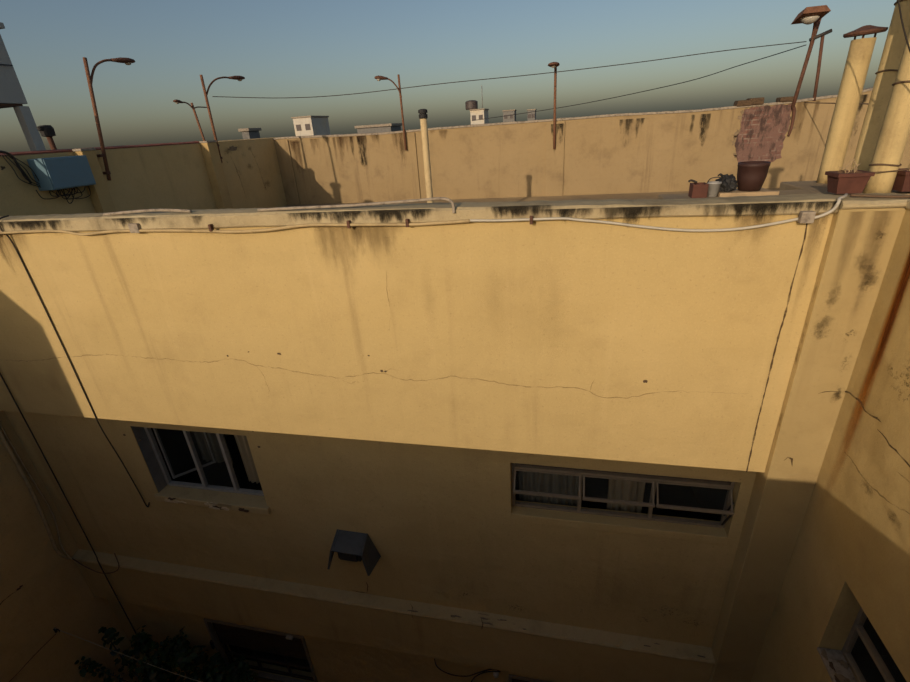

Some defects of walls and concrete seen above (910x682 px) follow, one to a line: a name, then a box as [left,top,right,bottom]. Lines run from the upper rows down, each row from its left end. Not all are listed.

water stain [334,209,429,220]
water stain [492,205,591,216]
water stain [605,206,660,219]
crack [746,223,808,472]
corrosion [850,253,910,437]
crack [818,391,910,467]